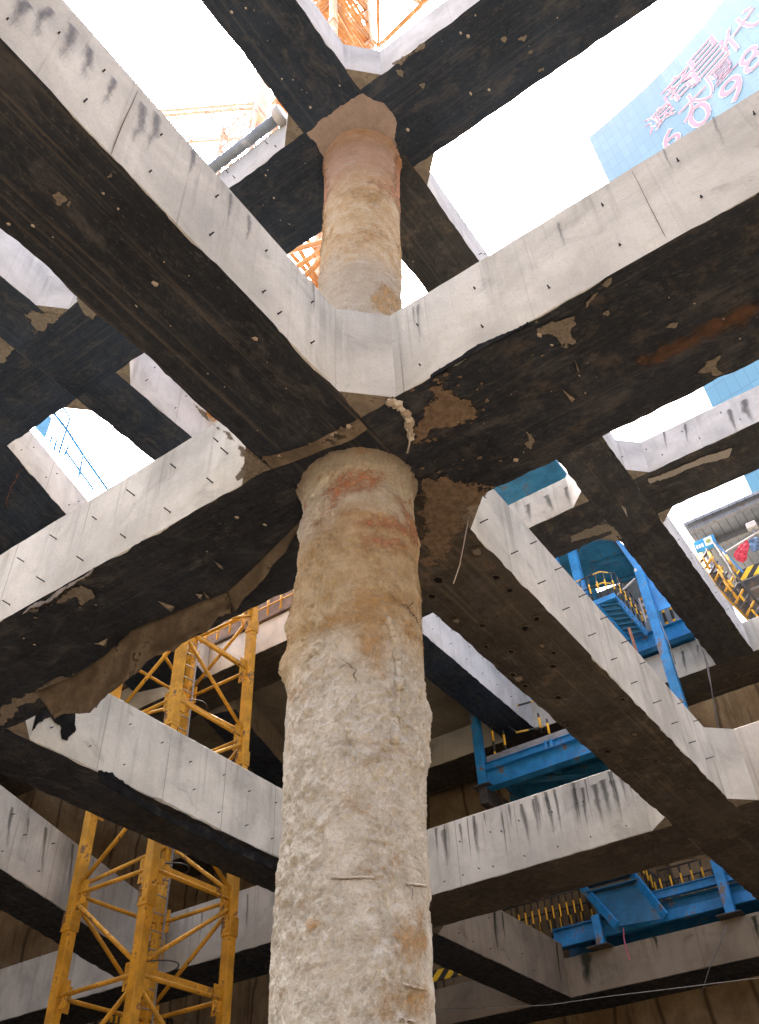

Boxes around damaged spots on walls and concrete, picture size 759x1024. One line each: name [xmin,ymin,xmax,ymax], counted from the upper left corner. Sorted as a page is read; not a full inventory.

leakage [19,2,53,19]
peeling [24,311,63,334]
peeling [531,316,586,357]
peeling [698,355,724,376]
peeling [385,373,489,453]
peeling [648,448,732,483]
peeling [414,456,501,600]
peeling [28,579,104,619]
peeling [0,673,75,726]
leakage [572,771,623,809]
leakage [501,789,558,833]